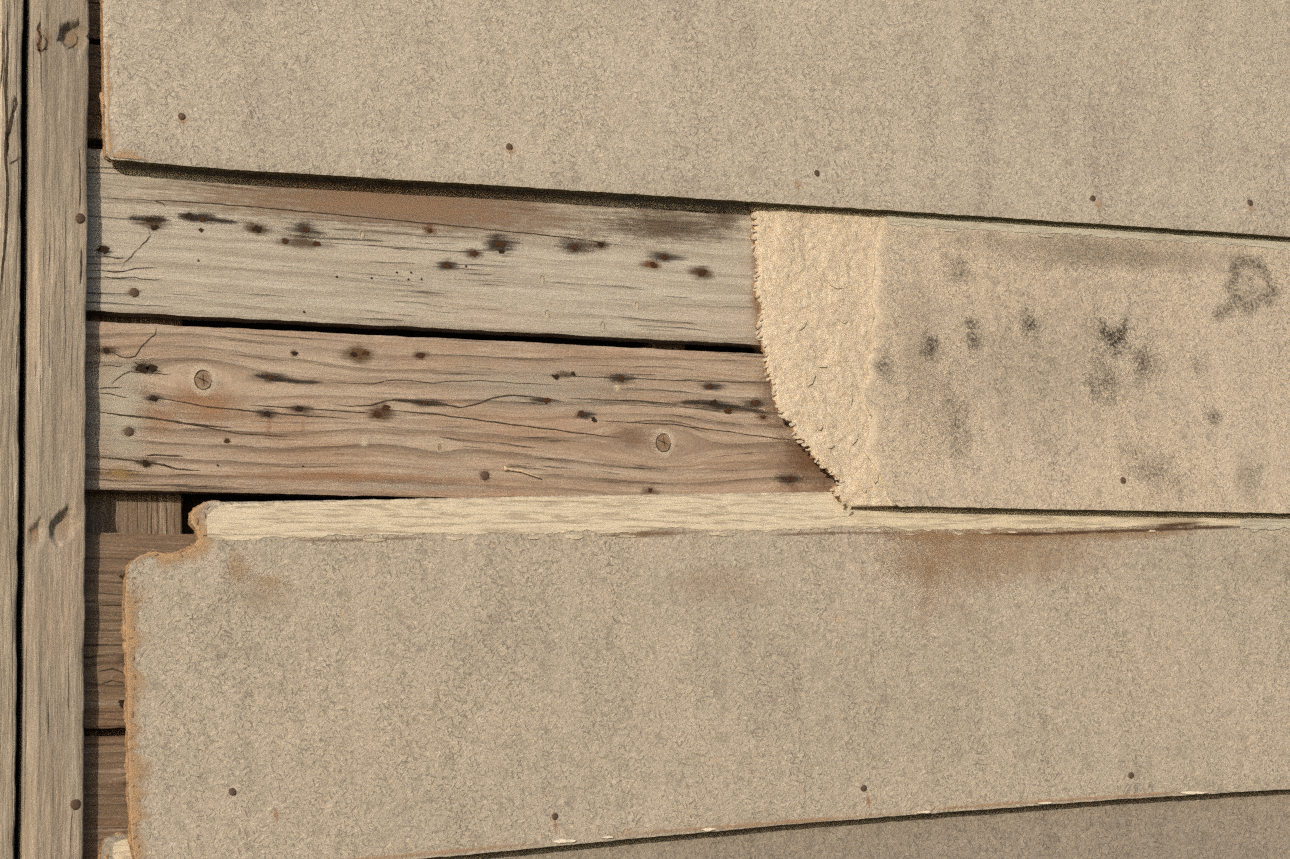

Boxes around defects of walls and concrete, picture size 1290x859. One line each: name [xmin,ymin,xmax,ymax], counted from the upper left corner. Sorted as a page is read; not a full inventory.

peeling [146,204,1290,556]
spalling [98,563,141,859]